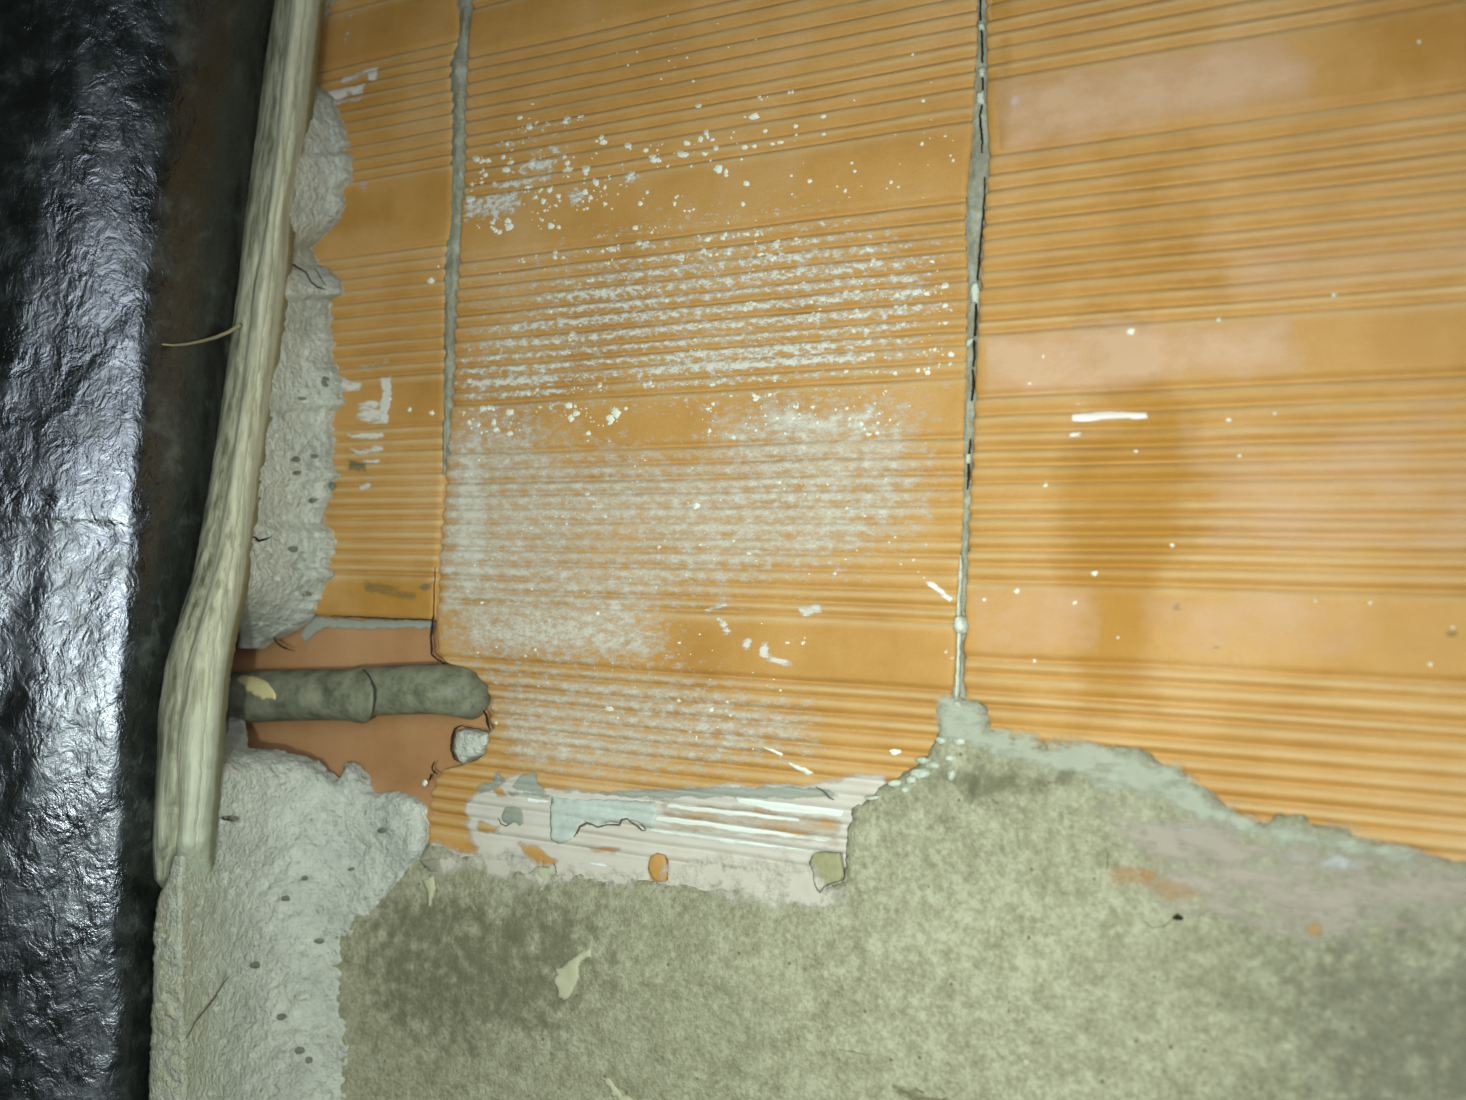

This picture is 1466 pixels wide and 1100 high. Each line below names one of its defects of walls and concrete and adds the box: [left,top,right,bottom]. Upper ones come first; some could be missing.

leakage [463,121,587,222]
crack [971,0,985,401]
leakage [367,200,956,776]
crack [965,439,973,490]
spalling [231,614,452,700]
peeling [245,698,885,909]
spalling [186,977,228,1038]
spalling [295,1047,313,1064]